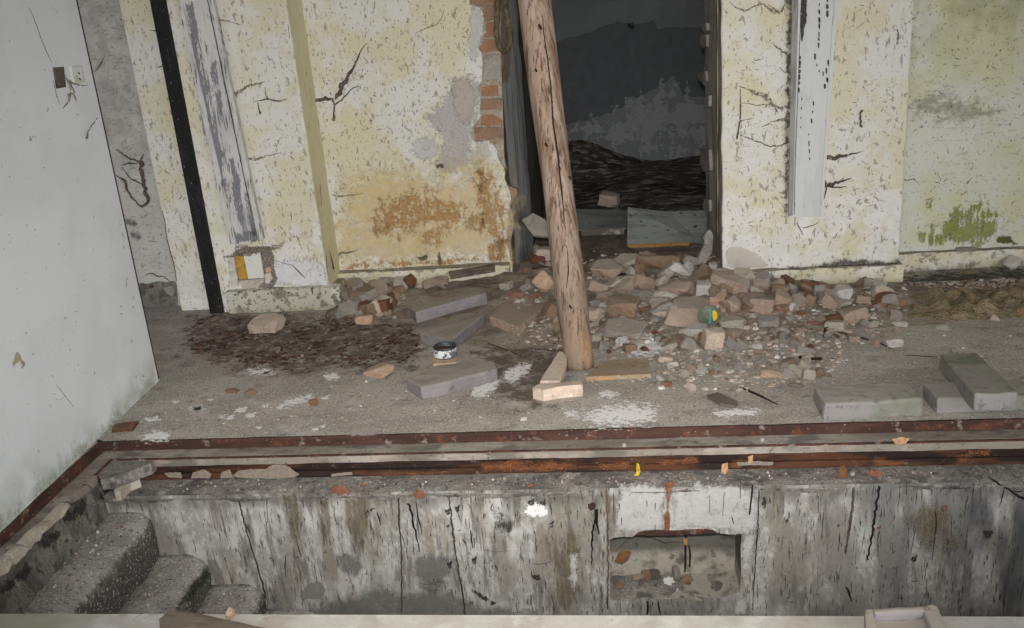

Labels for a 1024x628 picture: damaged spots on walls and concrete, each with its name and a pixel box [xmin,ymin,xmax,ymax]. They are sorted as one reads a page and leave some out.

peeling [185,2,328,289]
peeling [412,0,506,177]
leakage [326,162,508,272]
crack [218,501,266,598]
crack [448,496,466,615]
spalling [0,469,1024,617]
corrosion [480,459,573,472]
corrosion [663,482,674,531]